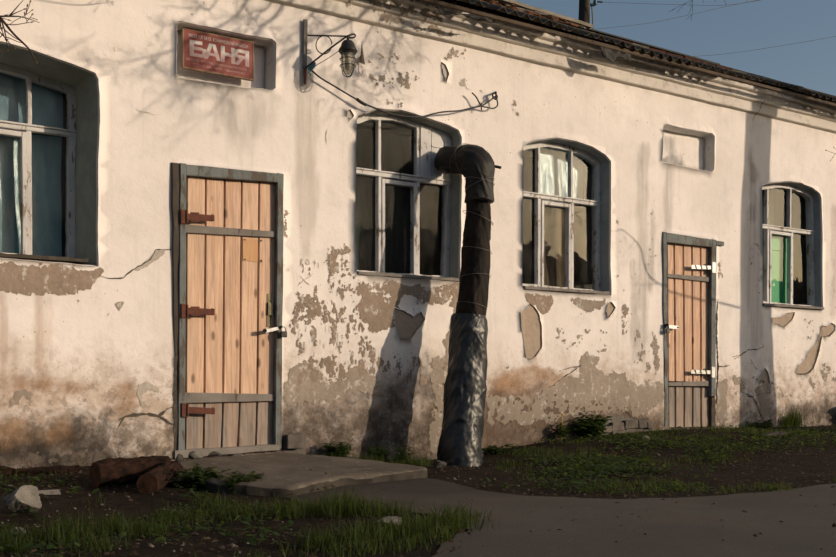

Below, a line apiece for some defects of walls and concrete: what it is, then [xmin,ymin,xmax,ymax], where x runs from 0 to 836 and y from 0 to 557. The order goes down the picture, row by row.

peeling [368,52,419,89]
peeling [347,0,467,79]
flaking render [0,261,104,302]
crack [100,249,172,279]
crack [117,345,178,458]
flaking render [283,243,459,456]
flaking render [485,293,665,435]
crack [716,303,764,404]
flaking render [716,365,792,422]
flaking render [772,313,794,326]
flaking render [795,319,836,392]